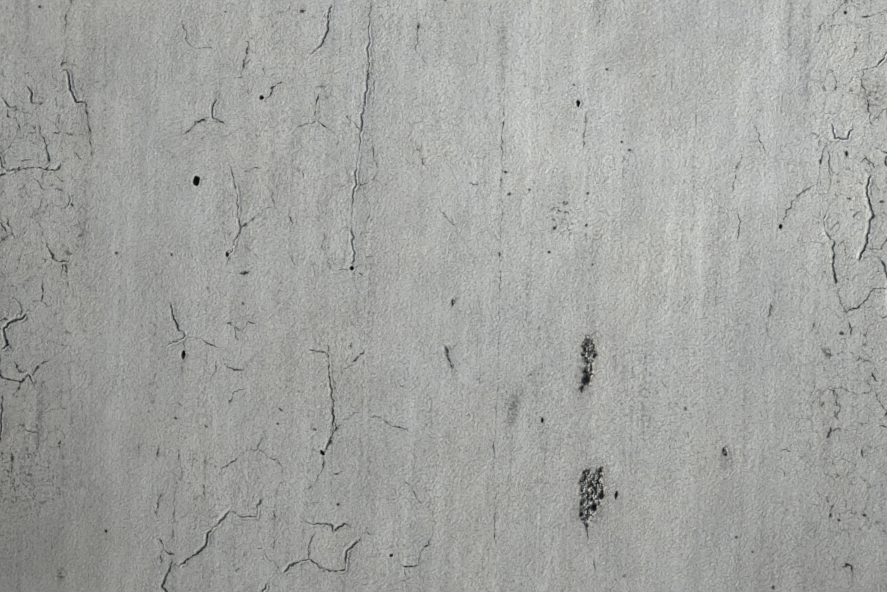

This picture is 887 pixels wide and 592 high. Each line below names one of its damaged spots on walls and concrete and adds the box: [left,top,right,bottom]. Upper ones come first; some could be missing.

crack [0,62,92,210]
crack [184,40,284,134]
crack [227,167,293,275]
crack [297,0,378,276]
crack [783,10,887,335]
crack [0,217,72,488]
crack [165,301,254,405]
crack [307,342,408,489]
crack [138,443,371,592]